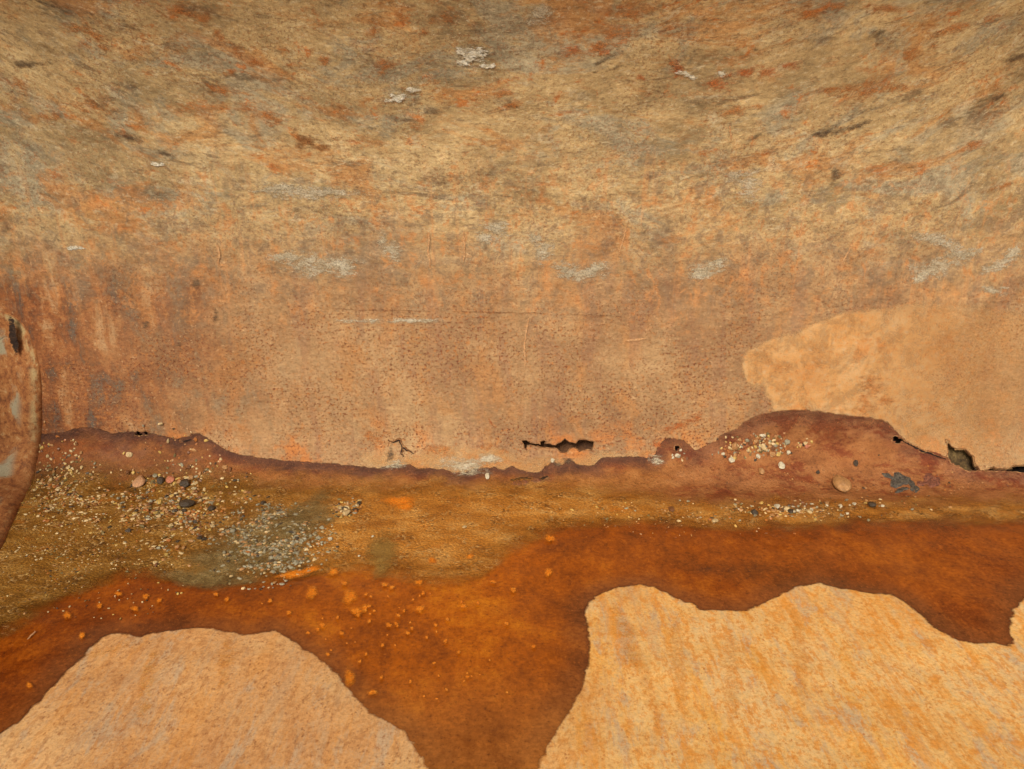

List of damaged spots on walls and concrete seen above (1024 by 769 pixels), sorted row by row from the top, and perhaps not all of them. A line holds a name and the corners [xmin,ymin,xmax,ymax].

corrosion [297,135,329,150]
crack [388,438,414,457]
crack [903,440,946,459]
water stain [0,305,1024,769]